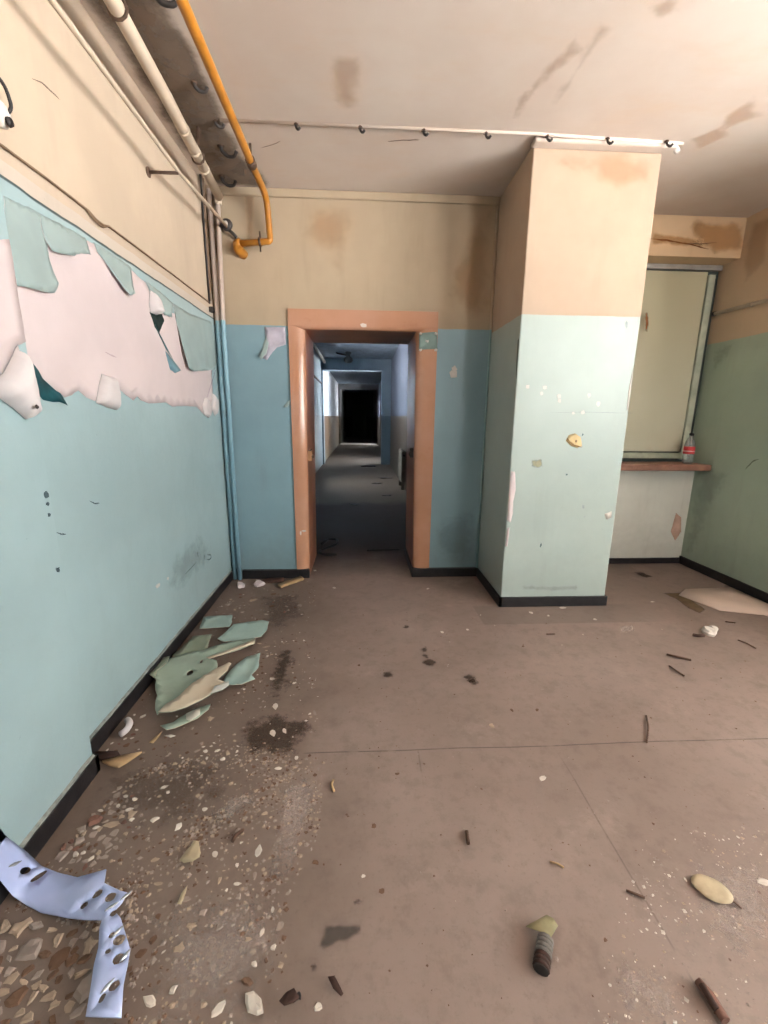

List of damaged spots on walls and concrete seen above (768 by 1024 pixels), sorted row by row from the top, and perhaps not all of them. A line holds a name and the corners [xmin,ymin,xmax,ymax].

crack [656,239,717,249]
peeling [0,196,219,420]
peeling [259,327,286,360]
flaking render [566,433,584,448]
flaking render [505,471,516,546]
peeling [671,513,681,540]